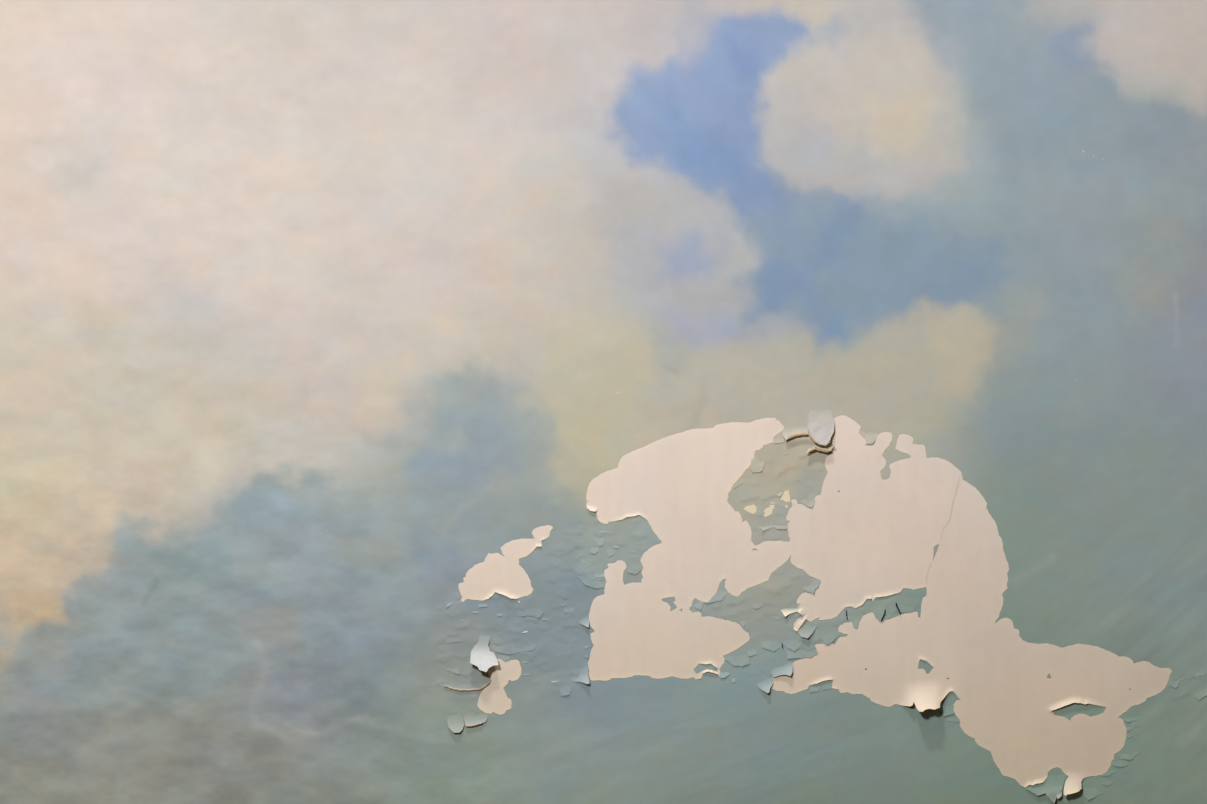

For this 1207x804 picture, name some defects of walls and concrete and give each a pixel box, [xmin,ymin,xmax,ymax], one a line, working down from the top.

peeling [431,525,553,733]
peeling [552,409,1172,803]